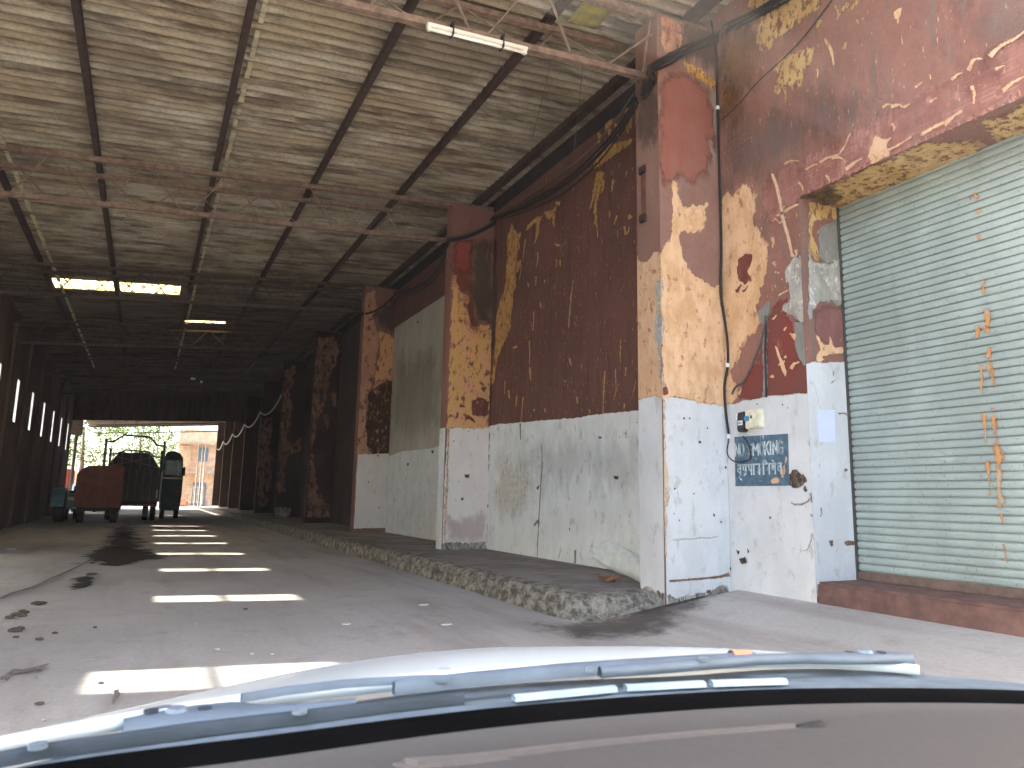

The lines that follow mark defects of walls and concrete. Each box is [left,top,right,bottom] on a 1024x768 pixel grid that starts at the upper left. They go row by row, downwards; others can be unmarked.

peeling [748,0,847,100]
peeling [951,31,1024,81]
peeling [784,85,1024,262]
peeling [357,291,394,456]
peeling [446,201,560,442]
peeling [637,180,780,406]
peeling [770,346,800,378]
peeling [816,335,844,362]
corrosion [975,309,990,339]
corrosion [979,347,994,392]
corrosion [982,408,1005,523]
water stain [71,525,165,590]